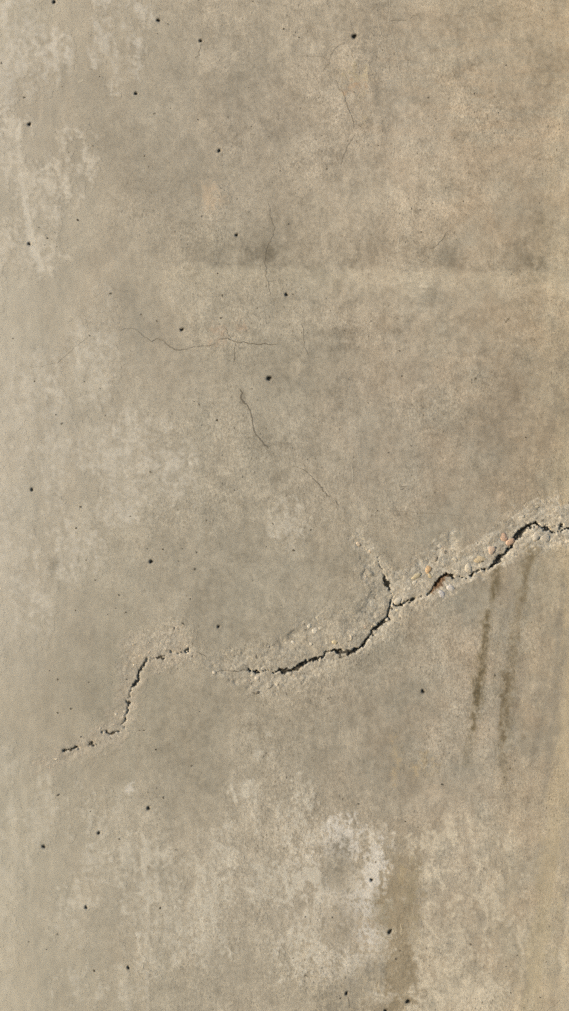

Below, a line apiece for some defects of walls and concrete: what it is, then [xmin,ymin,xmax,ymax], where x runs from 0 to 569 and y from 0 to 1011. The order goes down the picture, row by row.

crack [441,522,569,578]
crack [127,575,416,706]
crack [63,730,120,752]
damp [0,550,569,1011]